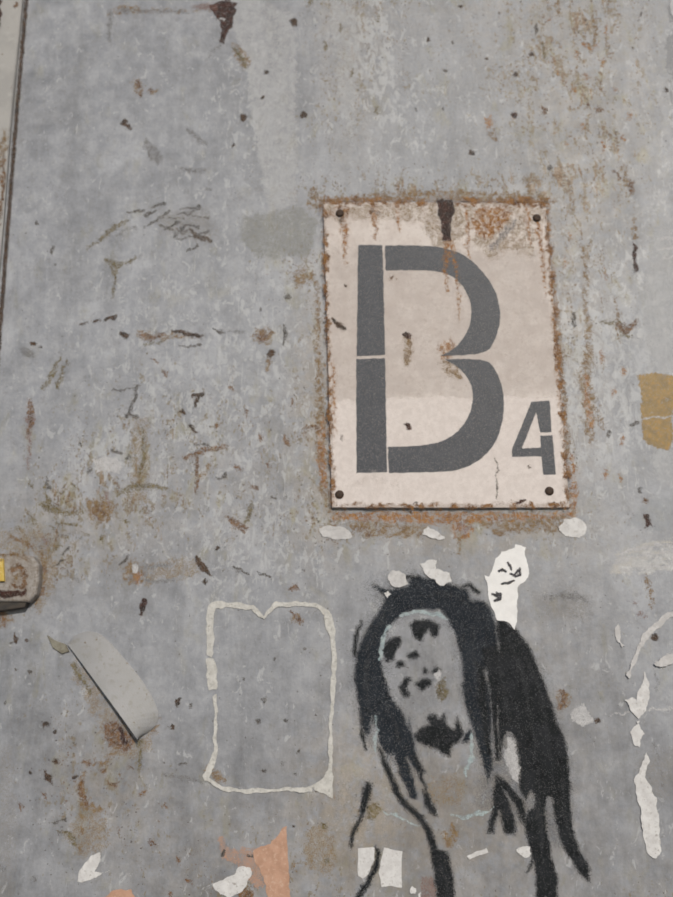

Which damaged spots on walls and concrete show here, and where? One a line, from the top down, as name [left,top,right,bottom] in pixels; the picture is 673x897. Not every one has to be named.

corrosion [191,0,251,70]
corrosion [306,176,556,210]
corrosion [613,166,635,194]
corrosion [631,217,639,273]
corrosion [285,235,639,555]
corrosion [53,658,162,860]